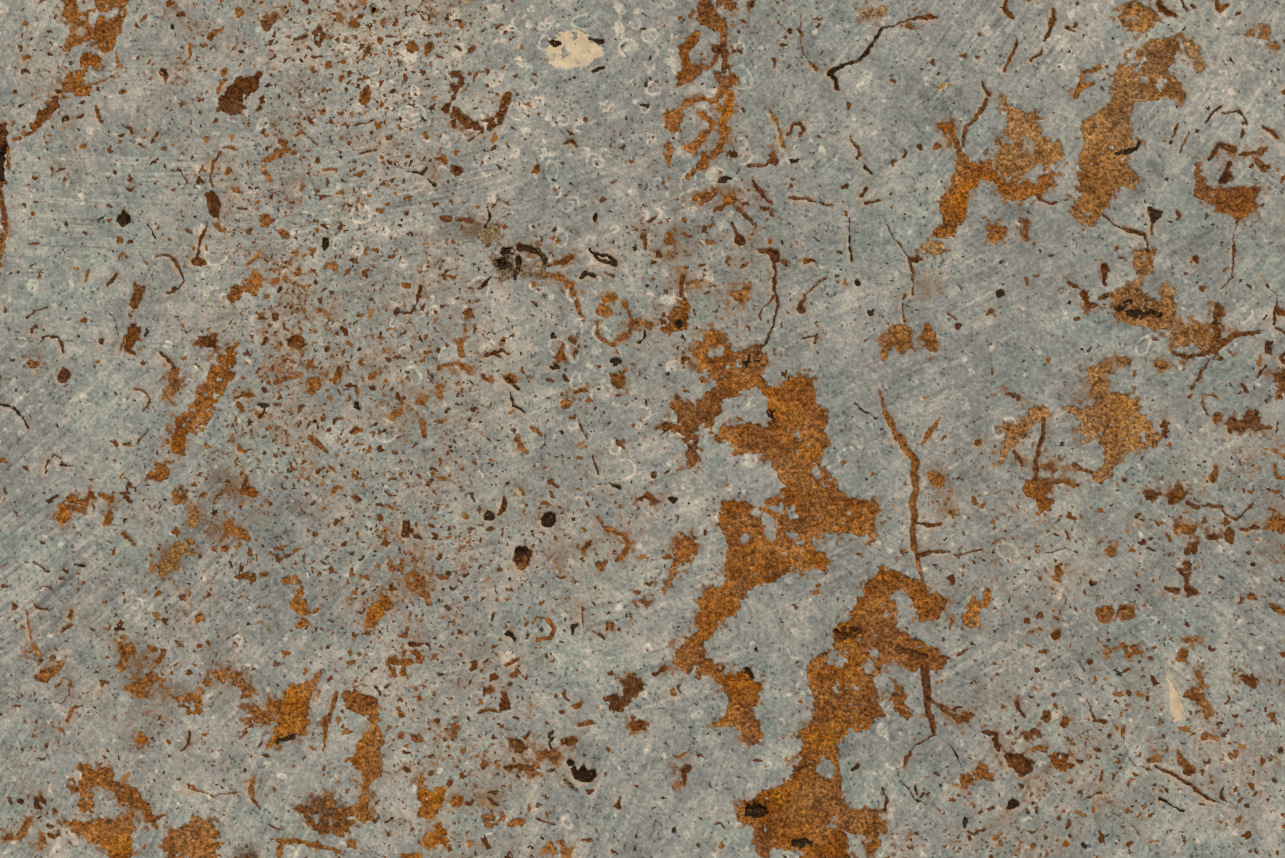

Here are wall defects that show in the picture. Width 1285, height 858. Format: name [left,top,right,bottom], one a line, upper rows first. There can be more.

spalling [0,0,141,276]
peeling [546,29,606,73]
spalling [891,0,1207,257]
spalling [120,282,145,355]
spalling [226,250,282,305]
spalling [879,323,938,362]
spalling [45,334,391,630]
spalling [348,550,458,628]
spalling [439,193,881,762]
spalling [993,357,1171,515]
spalling [1134,481,1224,598]
spalling [715,565,1126,858]